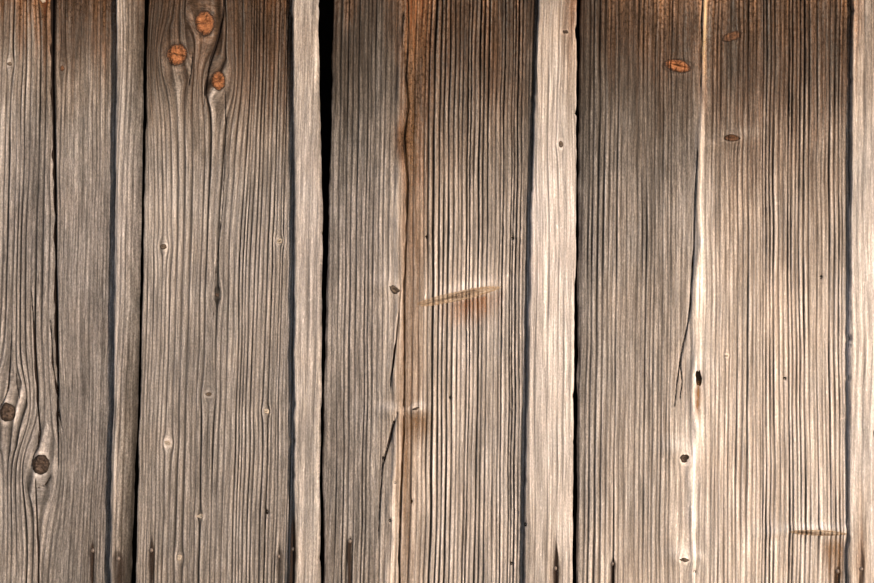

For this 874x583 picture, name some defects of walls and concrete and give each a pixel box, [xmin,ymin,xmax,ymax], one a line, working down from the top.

crack [378,0,409,583]
crack [675,150,698,403]